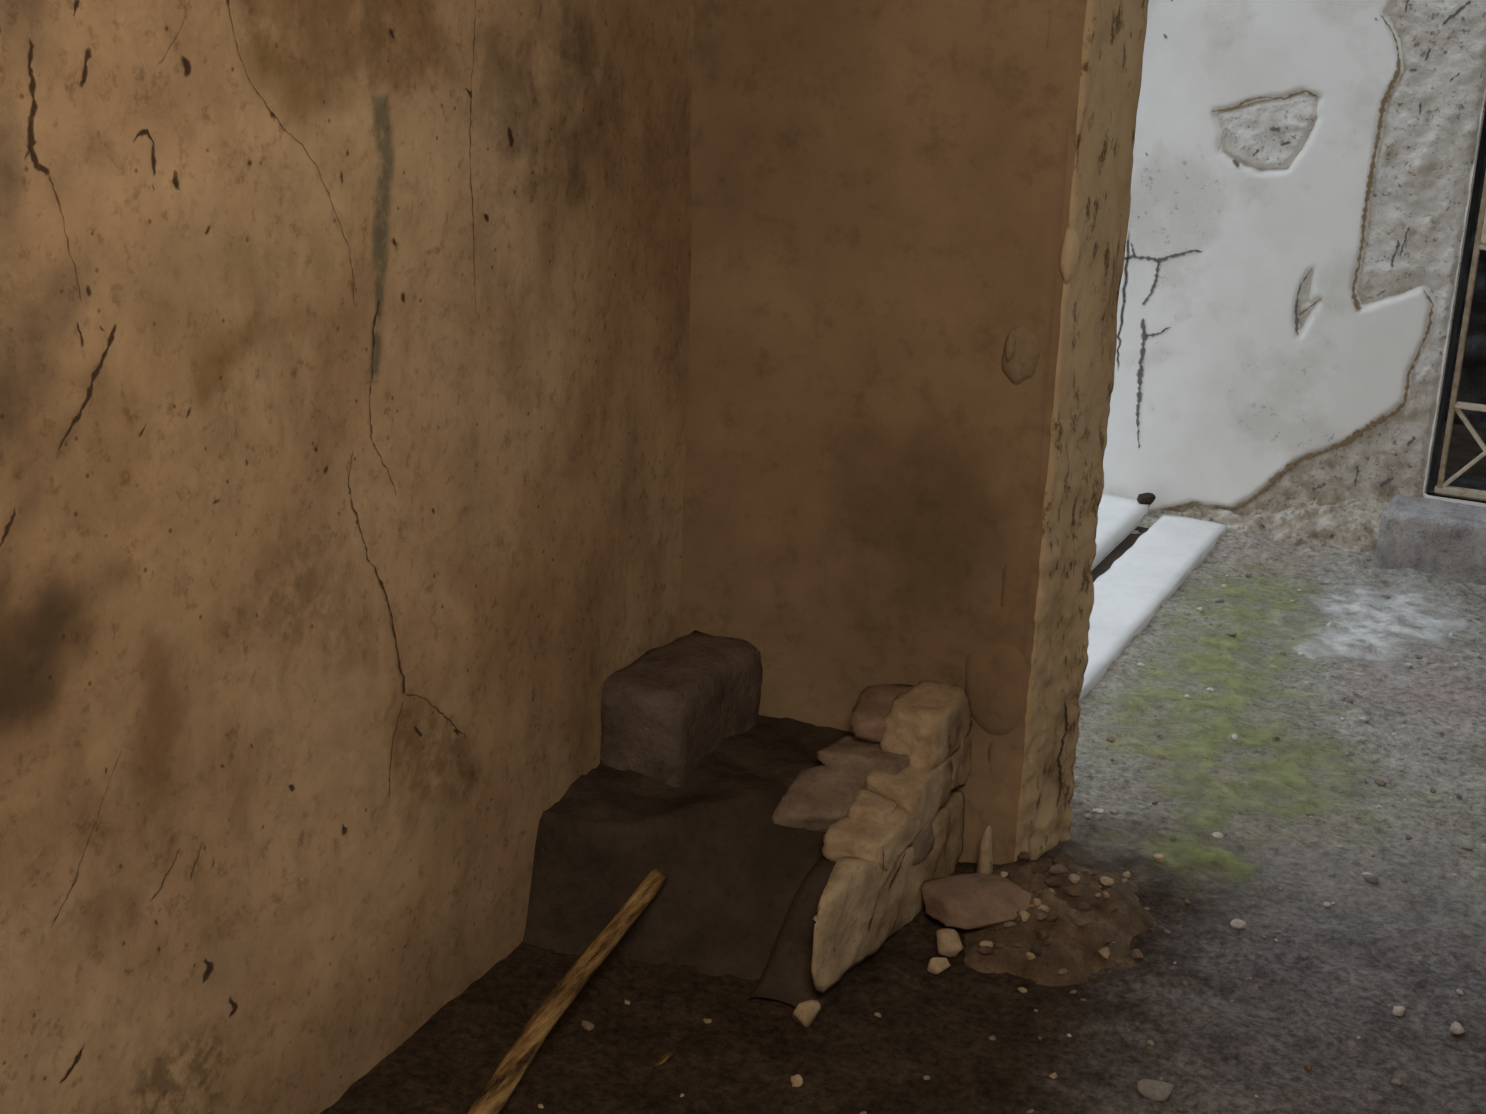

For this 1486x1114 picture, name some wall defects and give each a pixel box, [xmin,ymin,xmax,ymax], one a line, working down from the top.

crack [25,40,116,448]
crack [256,91,465,796]
damp [375,100,391,315]
crack [1116,238,1202,448]
flaking render [1179,0,1486,515]